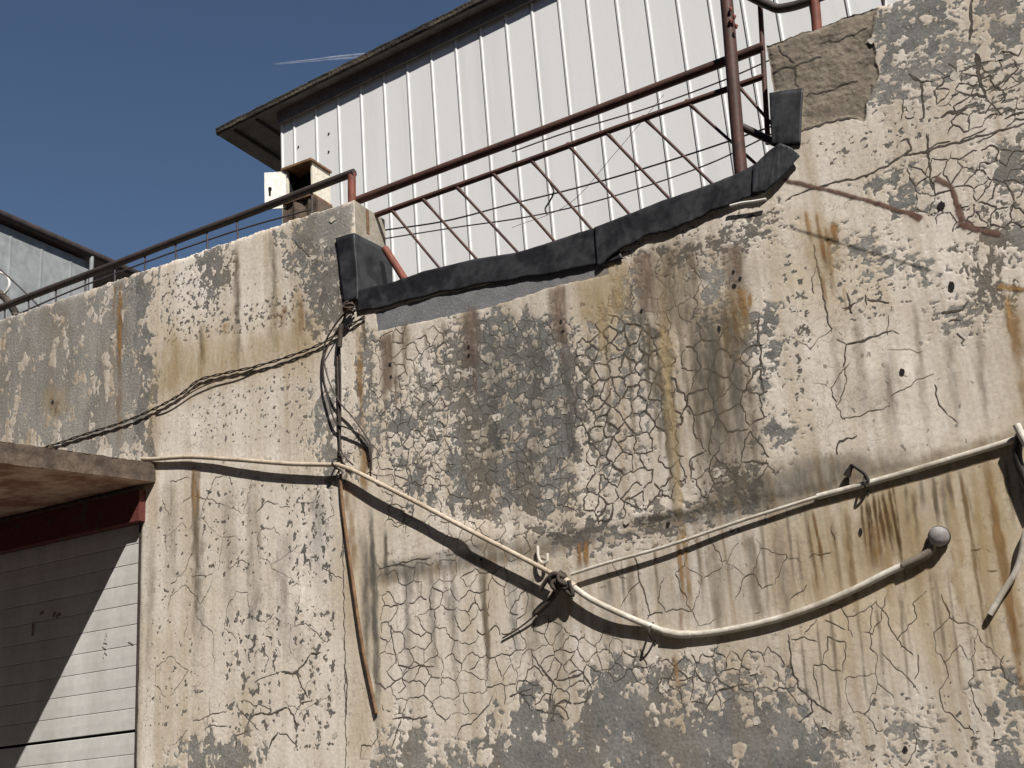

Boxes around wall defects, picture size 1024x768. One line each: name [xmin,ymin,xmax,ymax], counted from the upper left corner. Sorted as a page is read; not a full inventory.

rust [727,247,752,339]
rust [805,212,837,259]
rust [784,179,922,221]
spalling [766,0,1024,346]
crack [785,0,1024,234]
rust [935,176,1001,236]
peeling [0,197,813,587]
crack [162,244,1015,767]
rust [861,487,918,556]
peeling [361,644,1024,768]